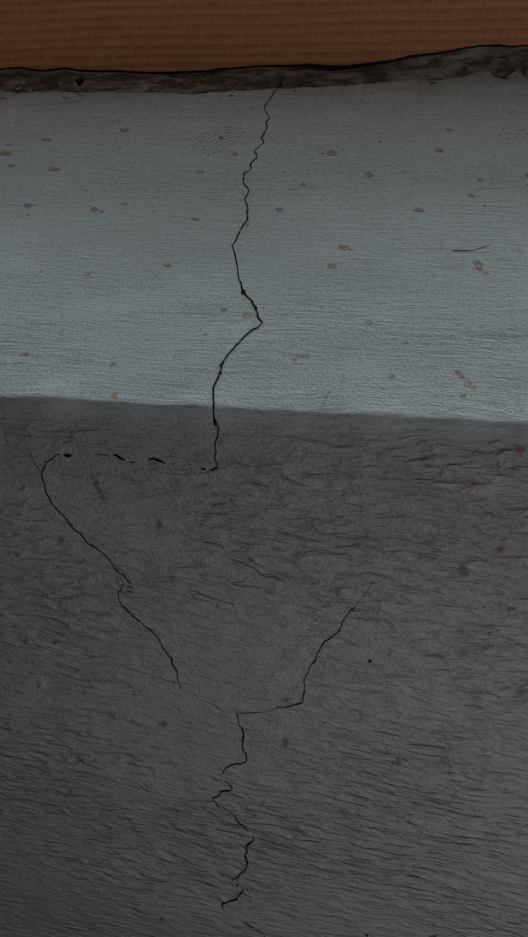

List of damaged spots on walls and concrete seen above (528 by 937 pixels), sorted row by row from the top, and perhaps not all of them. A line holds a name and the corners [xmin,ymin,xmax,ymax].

crack [95,75,285,471]
crack [31,454,181,688]
crack [190,542,287,603]
crack [212,583,373,937]